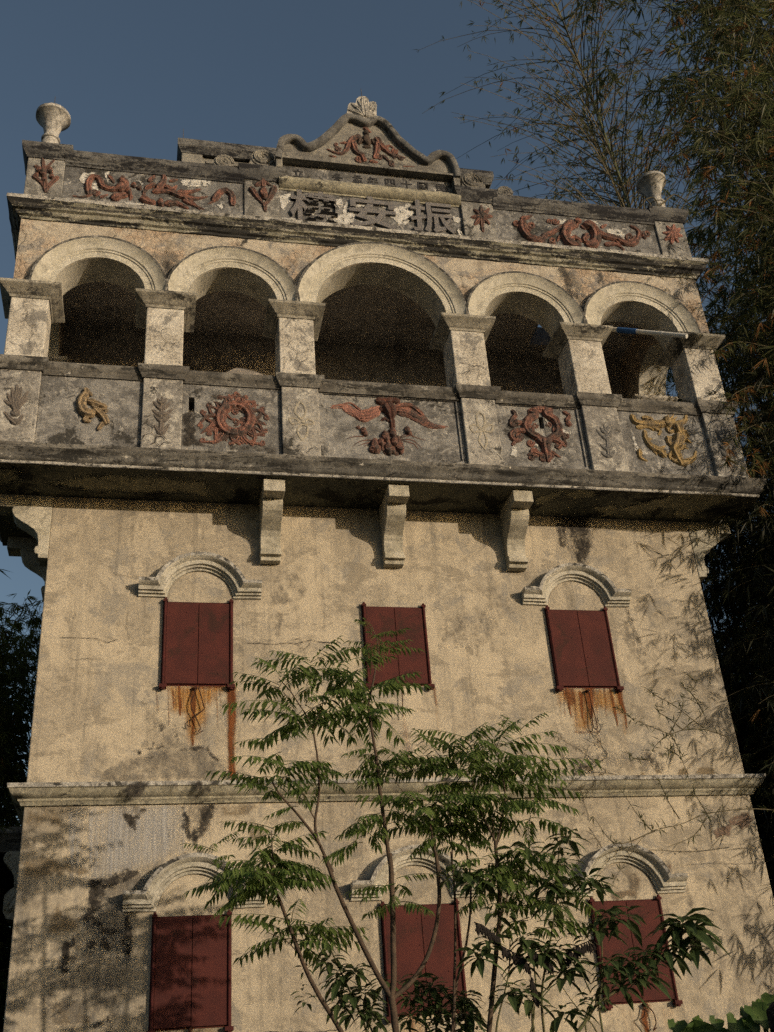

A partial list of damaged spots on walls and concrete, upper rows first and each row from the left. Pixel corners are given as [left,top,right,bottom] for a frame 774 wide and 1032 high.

leakage [554,517,593,563]
rust [168,683,236,780]
rust [561,688,627,728]
leakage [42,718,219,1028]